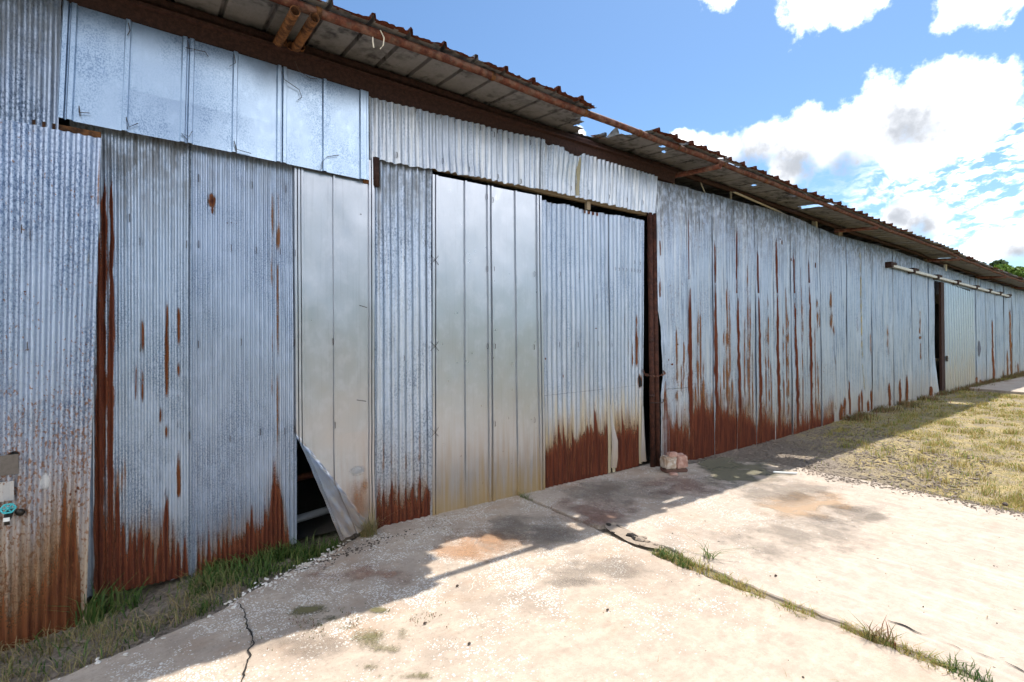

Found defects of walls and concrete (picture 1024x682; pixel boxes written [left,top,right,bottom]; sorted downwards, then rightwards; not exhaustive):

corrosion [663,230,872,460]
corrosion [0,154,289,651]
corrosion [888,378,909,406]
corrosion [545,410,639,488]
corrosion [353,476,431,529]
crack [237,602,255,682]